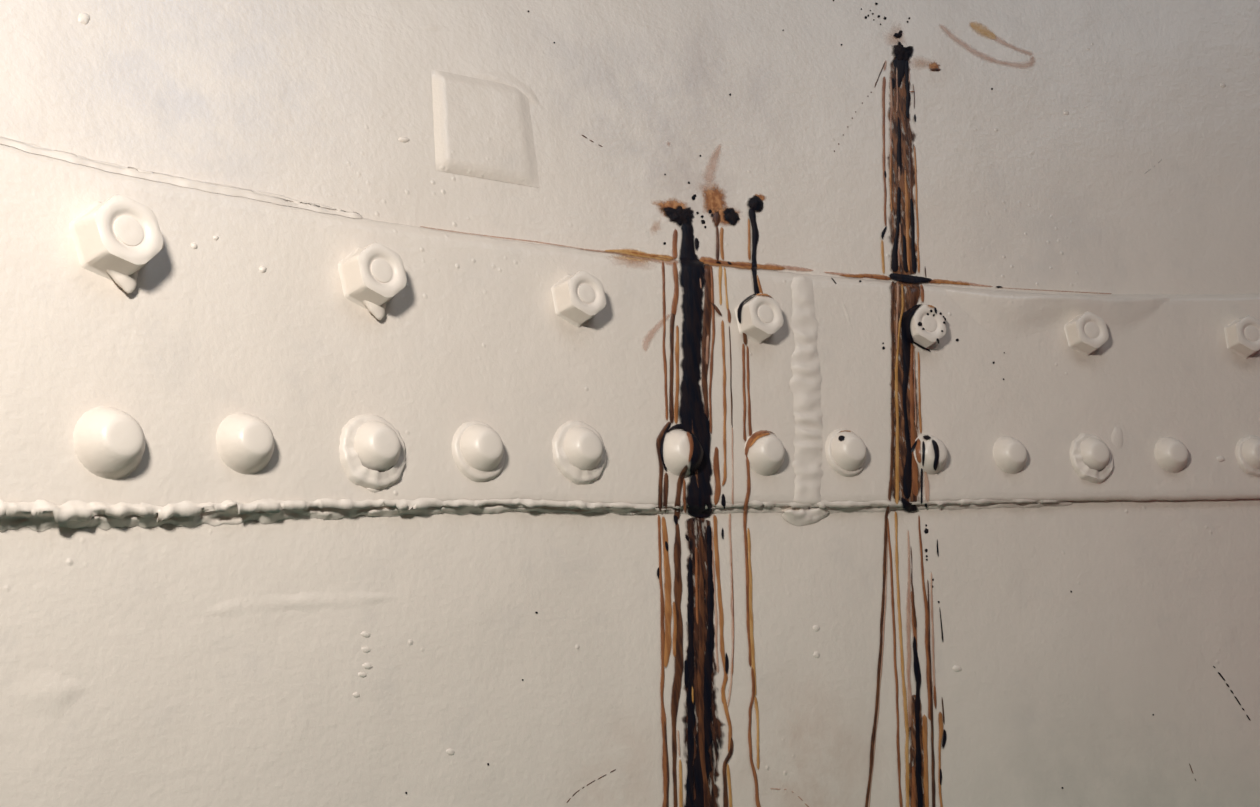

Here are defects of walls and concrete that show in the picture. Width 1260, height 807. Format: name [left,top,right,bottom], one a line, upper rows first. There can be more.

corrosion [583,30,1002,807]